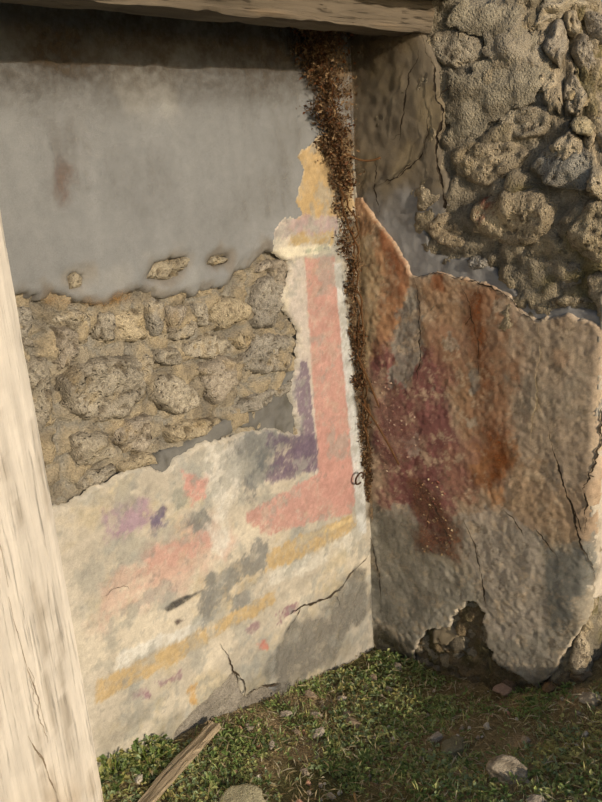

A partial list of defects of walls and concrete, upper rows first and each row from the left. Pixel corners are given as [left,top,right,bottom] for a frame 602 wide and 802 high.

crack [373,40,460,212]
crack [413,272,602,576]
crack [464,522,486,605]
crack [221,645,290,698]
spalling [415,601,541,690]